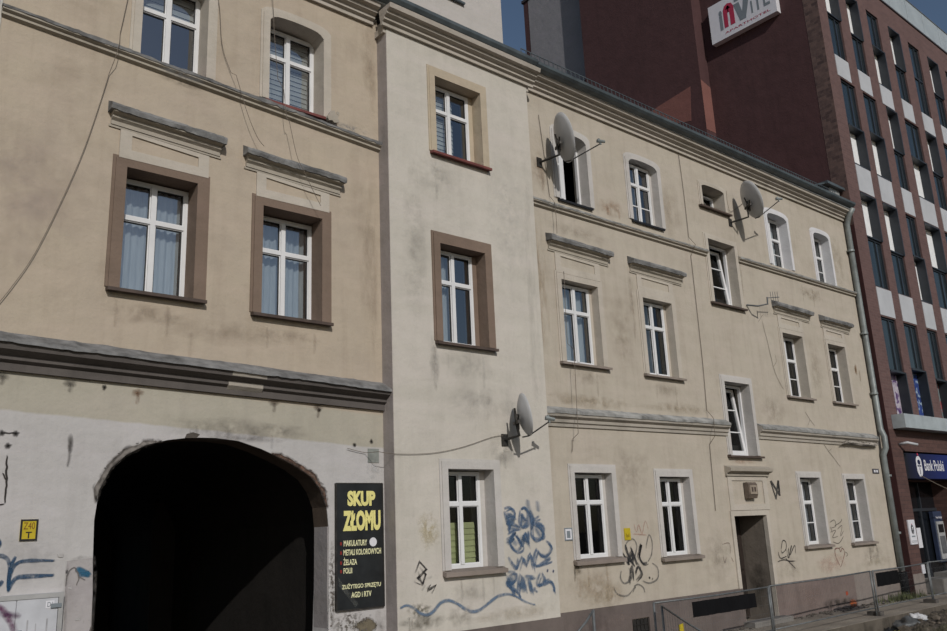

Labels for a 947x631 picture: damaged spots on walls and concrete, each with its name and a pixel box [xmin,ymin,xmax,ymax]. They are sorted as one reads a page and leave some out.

spalling [94,439,162,501]
spalling [271,453,327,506]
spalling [330,563,377,631]